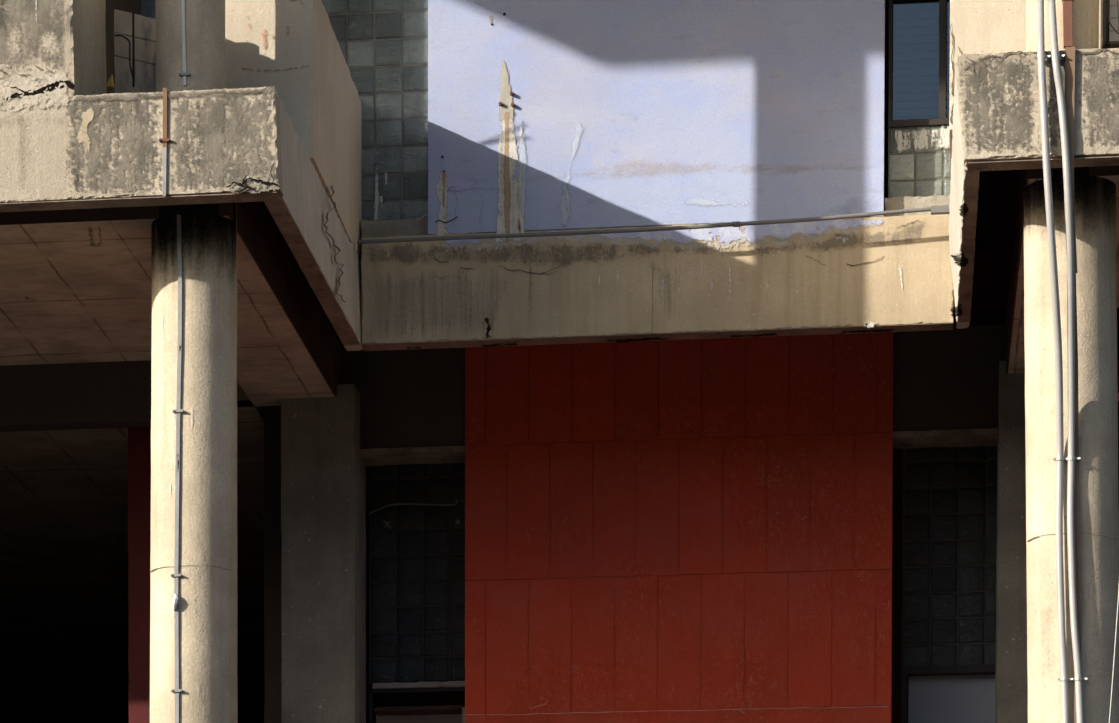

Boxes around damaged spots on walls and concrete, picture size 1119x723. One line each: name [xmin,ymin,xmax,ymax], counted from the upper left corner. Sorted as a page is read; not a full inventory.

water stain [0,0,71,70]
crack [0,64,277,104]
water stain [63,87,275,196]
crack [226,163,278,192]
water stain [370,61,632,304]
water stain [959,52,1065,152]
water stain [1079,51,1119,150]
crack [324,186,345,302]
peeling [440,217,884,252]
water stain [811,223,923,250]